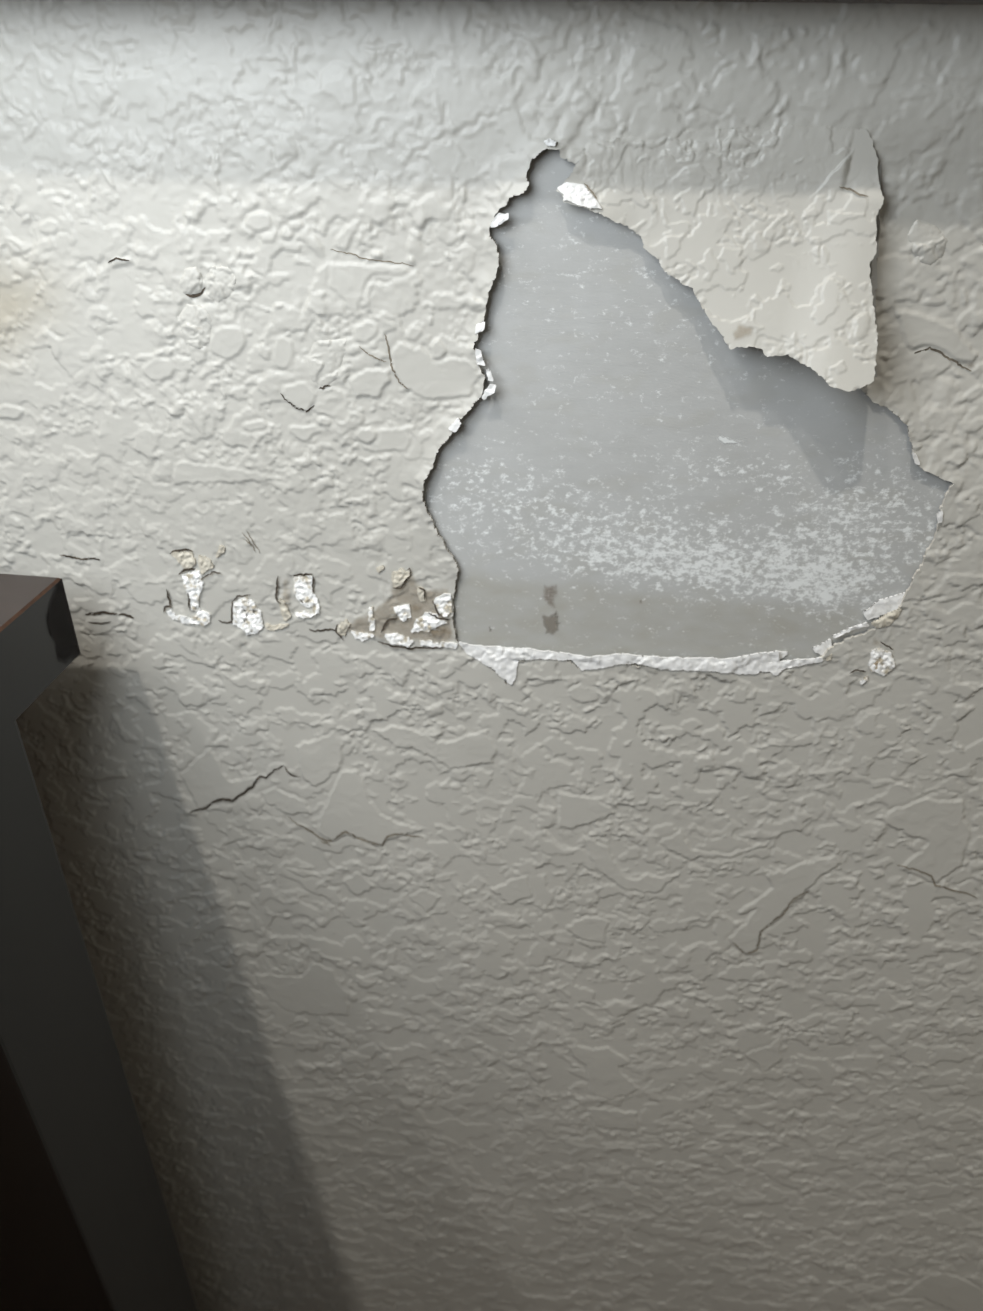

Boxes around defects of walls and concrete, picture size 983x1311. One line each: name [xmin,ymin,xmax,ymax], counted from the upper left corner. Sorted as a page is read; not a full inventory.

peeling [335,124,952,685]
peeling [163,545,225,627]
peeling [231,573,320,636]